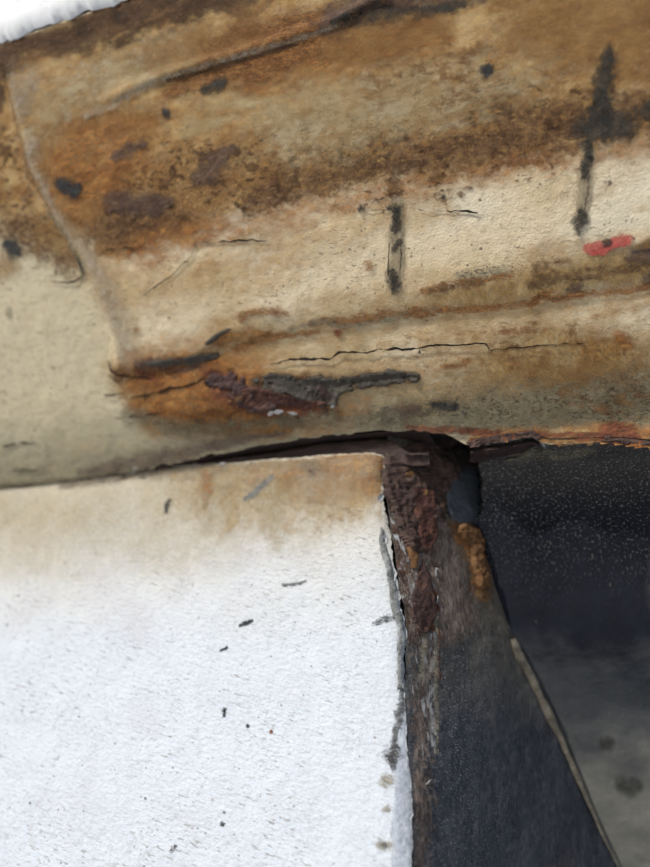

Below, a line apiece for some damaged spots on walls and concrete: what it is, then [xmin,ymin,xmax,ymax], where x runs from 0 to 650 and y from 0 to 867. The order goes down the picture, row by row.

rust [0,0,484,110]
damp [0,0,650,295]
crack [144,239,268,295]
spalling [133,328,420,418]
rust [59,241,650,489]
crack [270,342,583,365]
crack [0,431,436,503]
rust [381,421,650,867]